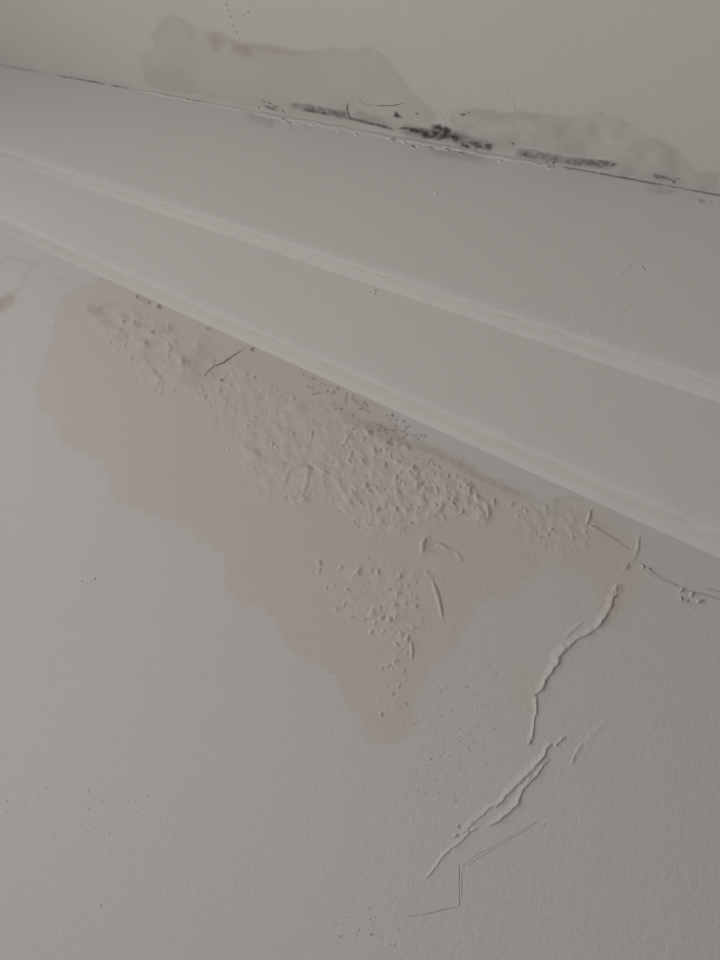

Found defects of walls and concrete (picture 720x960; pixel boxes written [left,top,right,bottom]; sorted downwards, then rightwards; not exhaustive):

water stain [137,9,720,206]
water stain [0,255,652,746]
crack [407,510,720,917]